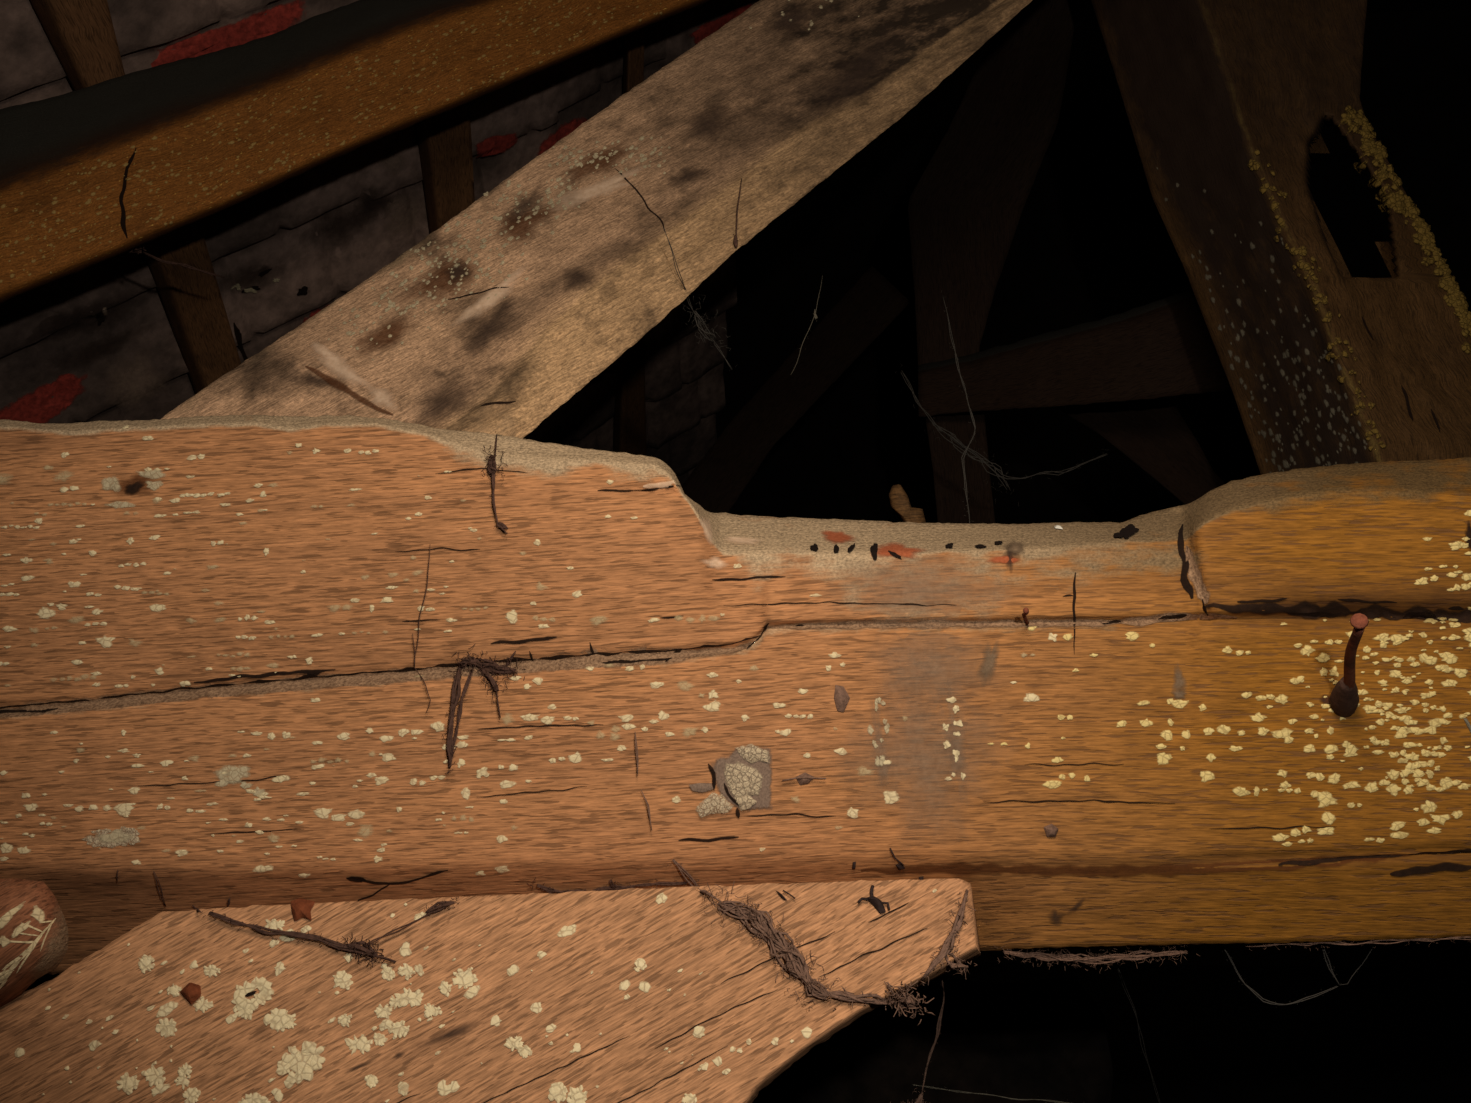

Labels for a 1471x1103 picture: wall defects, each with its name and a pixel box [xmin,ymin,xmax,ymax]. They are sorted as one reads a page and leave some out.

crack [119,148,136,238]
leakage [328,136,697,360]
crack [435,466,527,474]
crack [0,524,1471,718]
crack [480,722,603,730]
crack [143,776,297,786]
crack [482,786,587,797]
crack [983,762,1175,804]
crack [211,827,293,835]
crack [678,813,831,842]
crack [483,825,1471,1103]